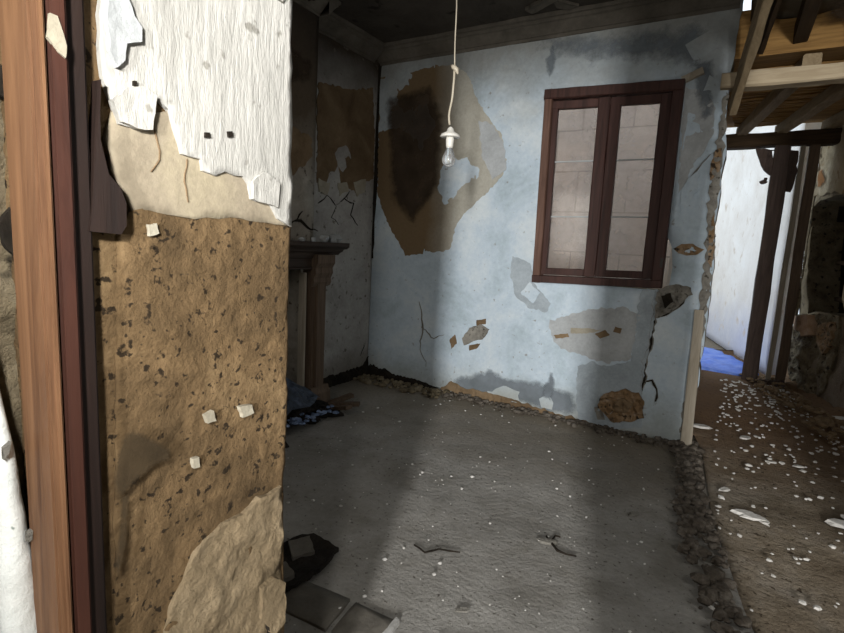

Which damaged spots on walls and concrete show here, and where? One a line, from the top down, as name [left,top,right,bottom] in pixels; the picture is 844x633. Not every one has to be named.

flaking render [95,0,507,633]
crack [292,64,382,258]
peeling [440,87,729,429]
crack [639,301,685,410]
spalling [788,125,844,397]